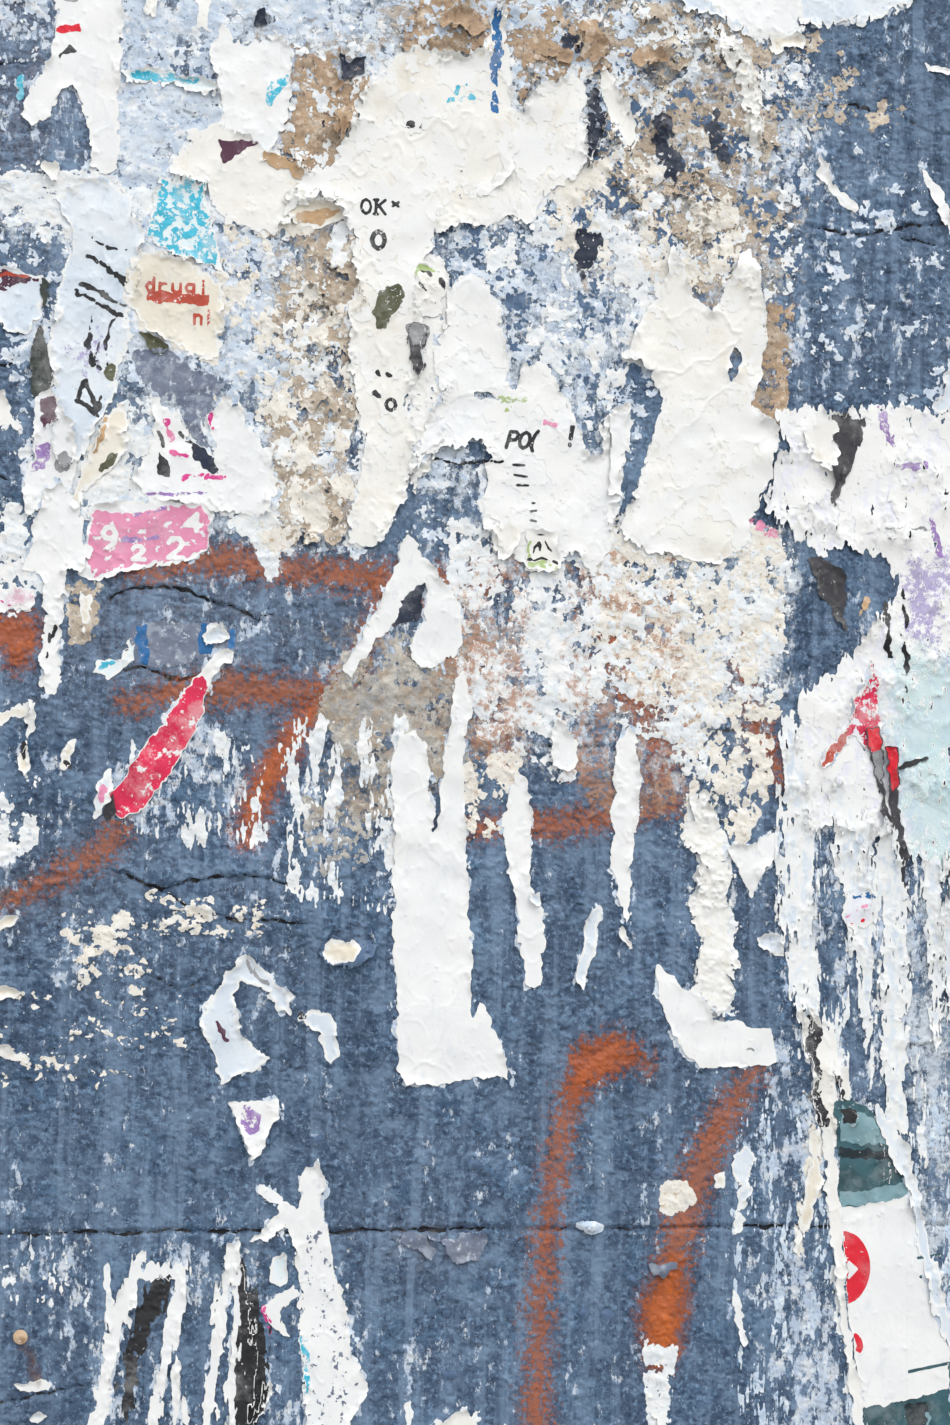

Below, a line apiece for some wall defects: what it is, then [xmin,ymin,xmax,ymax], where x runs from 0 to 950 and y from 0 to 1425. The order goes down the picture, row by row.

peeling [0,0,950,582]
peeling [0,497,44,618]
peeling [137,440,950,1070]
peeling [0,775,45,867]
peeling [0,888,267,1089]
peeling [2,1229,92,1308]
peeling [658,1180,697,1216]
peeling [714,1090,855,1425]
peeling [867,1005,950,1311]
peeling [14,1379,52,1392]
peeling [30,1412,47,1423]
peeling [642,1338,679,1425]